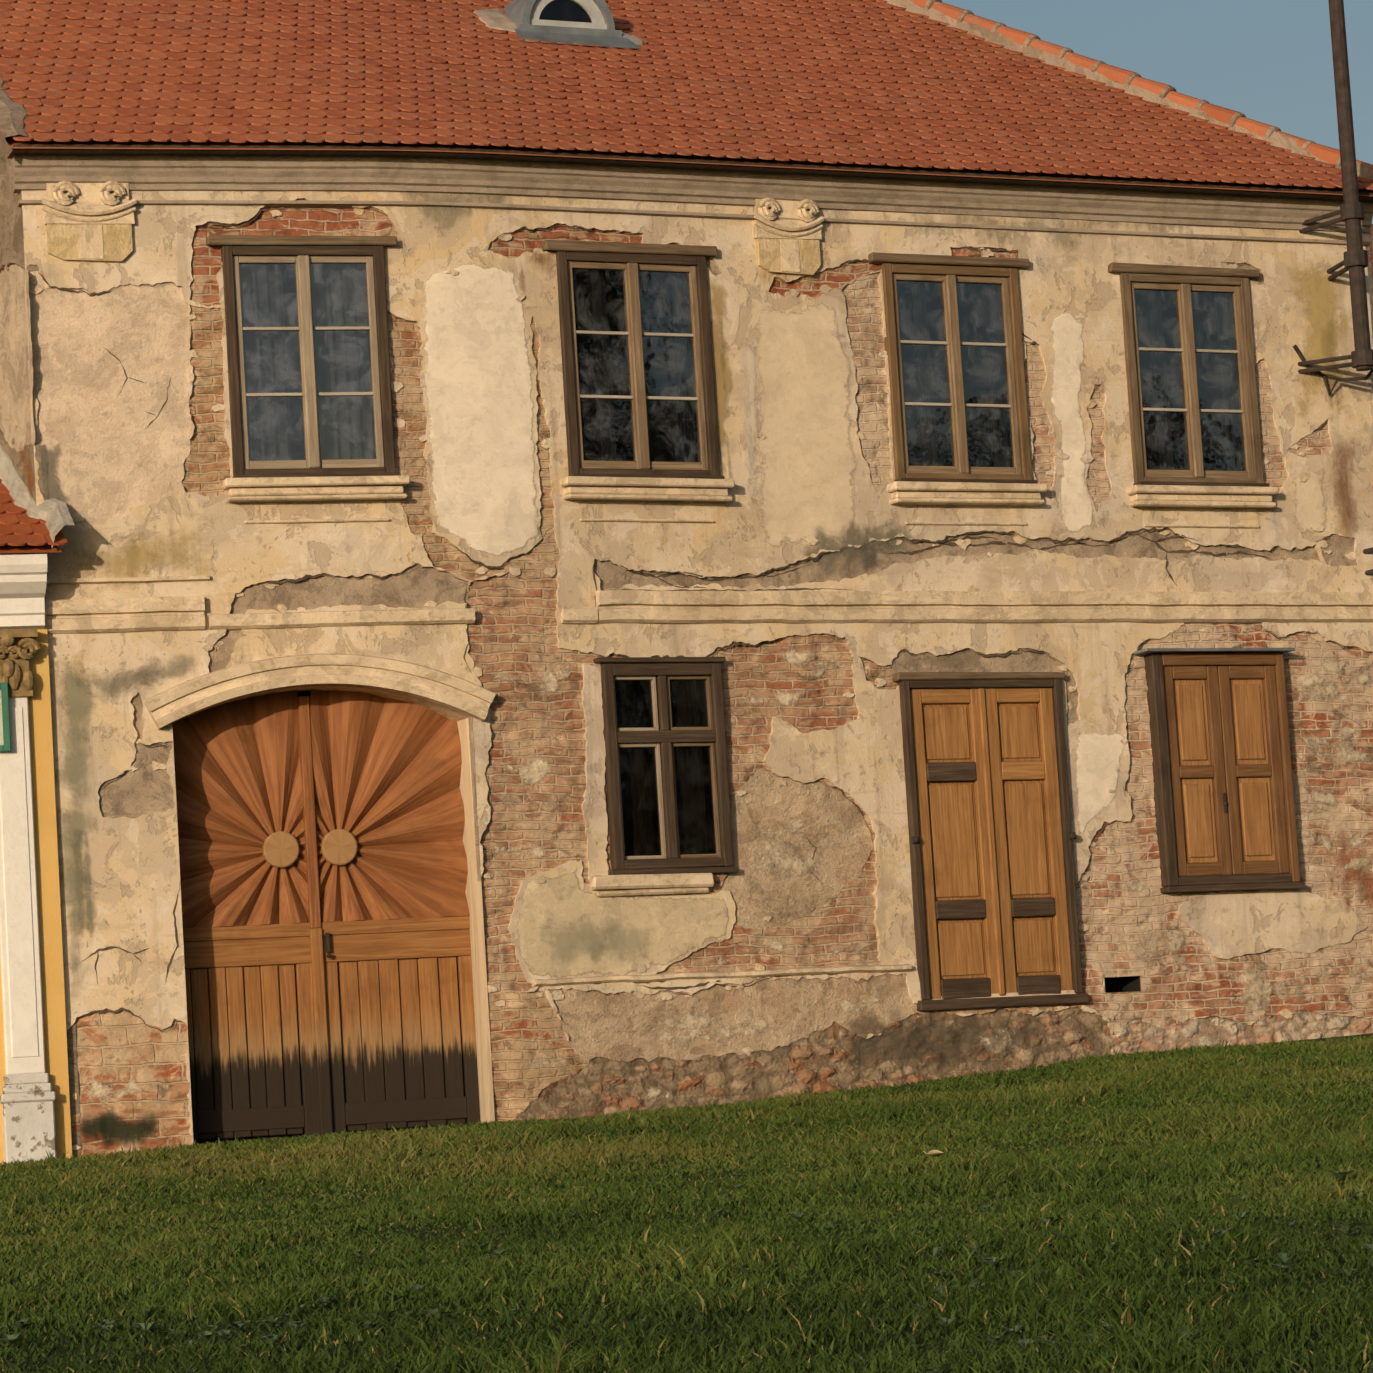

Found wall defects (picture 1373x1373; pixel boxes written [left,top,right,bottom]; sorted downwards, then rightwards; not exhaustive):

flaking render [487,223,643,258]
flaking render [1221,262,1265,285]
crack [105,348,171,426]
flaking render [0,198,400,531]
flaking render [769,259,892,489]
water stain [64,673,91,793]
flaking render [208,312,1373,1122]
water stain [62,812,92,926]
crack [83,884,180,984]
flaking render [67,1007,192,1158]